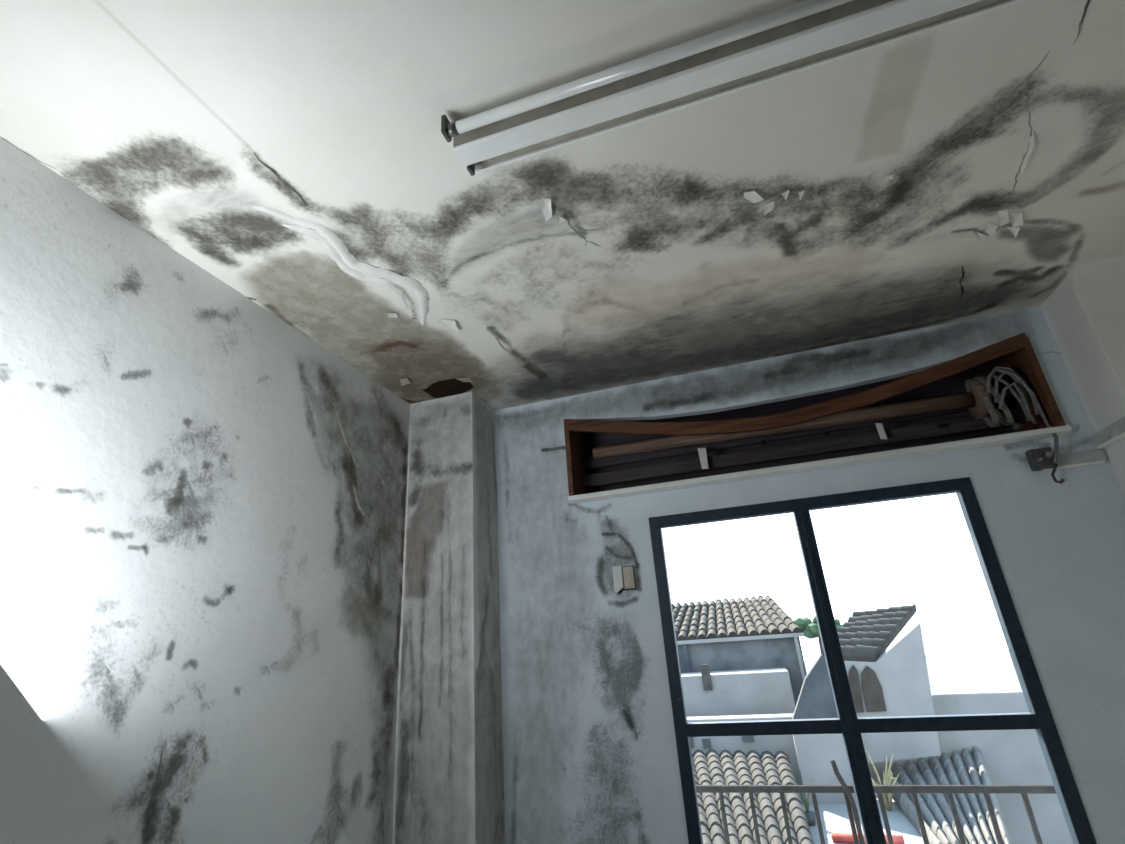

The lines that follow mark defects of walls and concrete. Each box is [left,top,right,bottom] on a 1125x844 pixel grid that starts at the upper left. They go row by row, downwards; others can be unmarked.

crack [1006,0,1090,205]
damp [71,140,223,225]
damp [179,213,296,265]
peeling [252,205,459,333]
damp [253,260,497,404]
damp [322,208,445,277]
damp [430,193,493,237]
damp [505,162,612,208]
damp [489,230,1068,398]
damp [774,77,1036,240]
crack [958,266,966,301]
spalling [400,378,473,403]